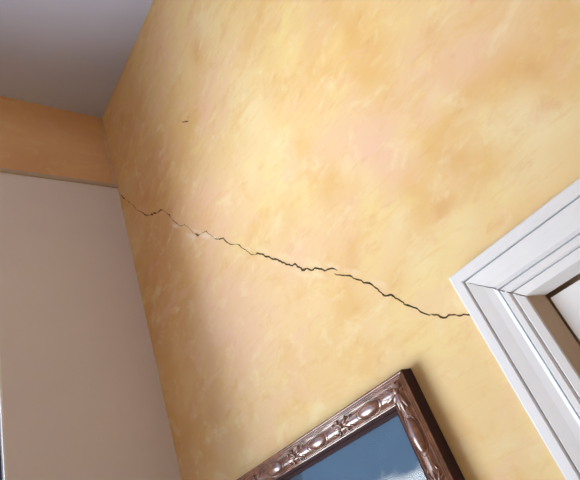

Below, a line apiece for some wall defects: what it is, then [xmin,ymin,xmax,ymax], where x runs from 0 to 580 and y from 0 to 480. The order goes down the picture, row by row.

crack [119,193,470,319]